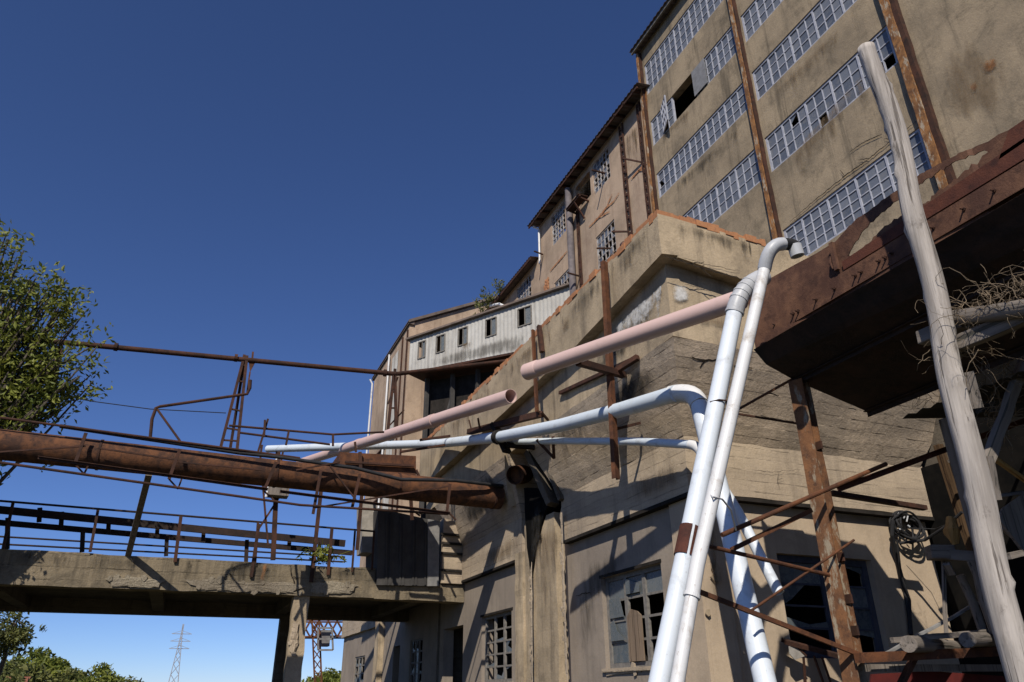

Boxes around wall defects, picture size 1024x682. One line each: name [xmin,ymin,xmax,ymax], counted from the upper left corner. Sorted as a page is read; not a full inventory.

spalling [461,210,766,405]